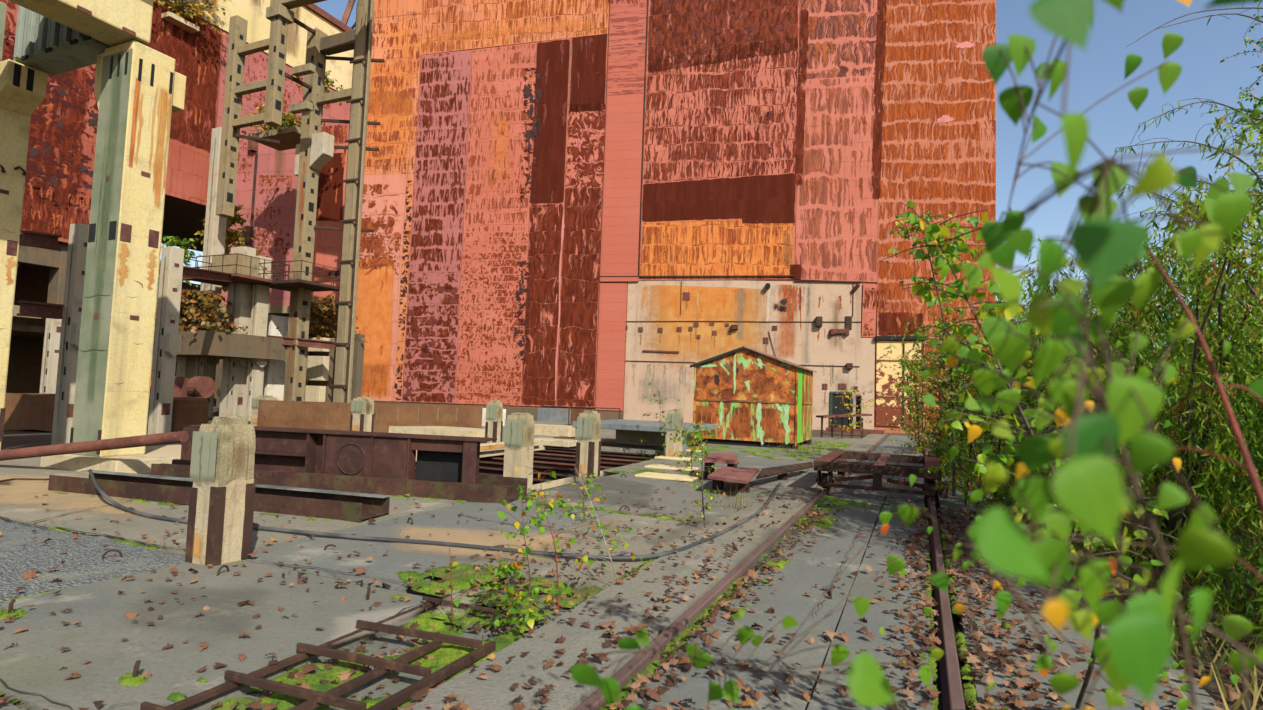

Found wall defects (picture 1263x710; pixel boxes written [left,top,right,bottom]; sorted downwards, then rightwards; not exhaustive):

corrosion [21,69,89,267]
corrosion [129,1,221,206]
corrosion [640,0,809,439]
corrosion [355,260,393,399]
peeling [719,354,736,426]
peeling [755,403,791,445]